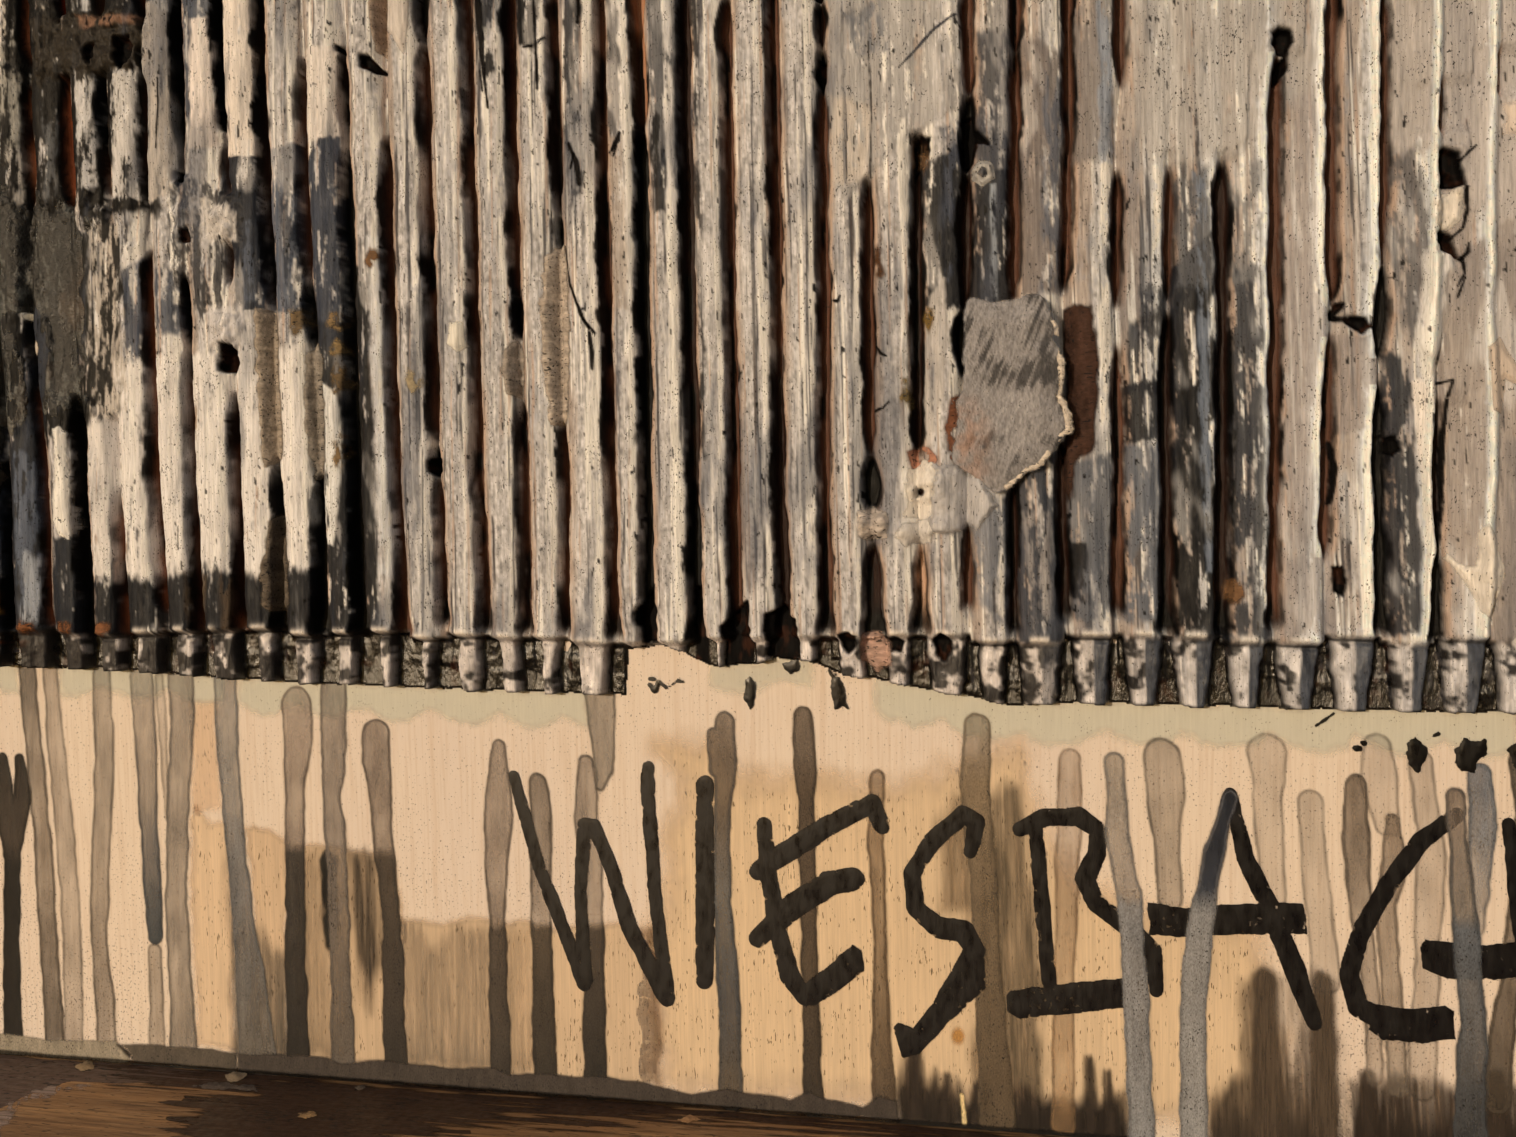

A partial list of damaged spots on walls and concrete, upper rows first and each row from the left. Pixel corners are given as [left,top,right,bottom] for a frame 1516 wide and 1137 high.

corrosion [365,249,380,267]
corrosion [874,248,884,278]
corrosion [923,308,933,331]
corrosion [289,310,355,393]
corrosion [900,378,914,408]
peeling [1061,304,1099,498]
corrosion [1223,579,1244,603]
corrosion [95,623,109,637]
damp [99,789,1129,1137]
damp [1210,969,1455,1137]
damp [1485,1088,1516,1137]